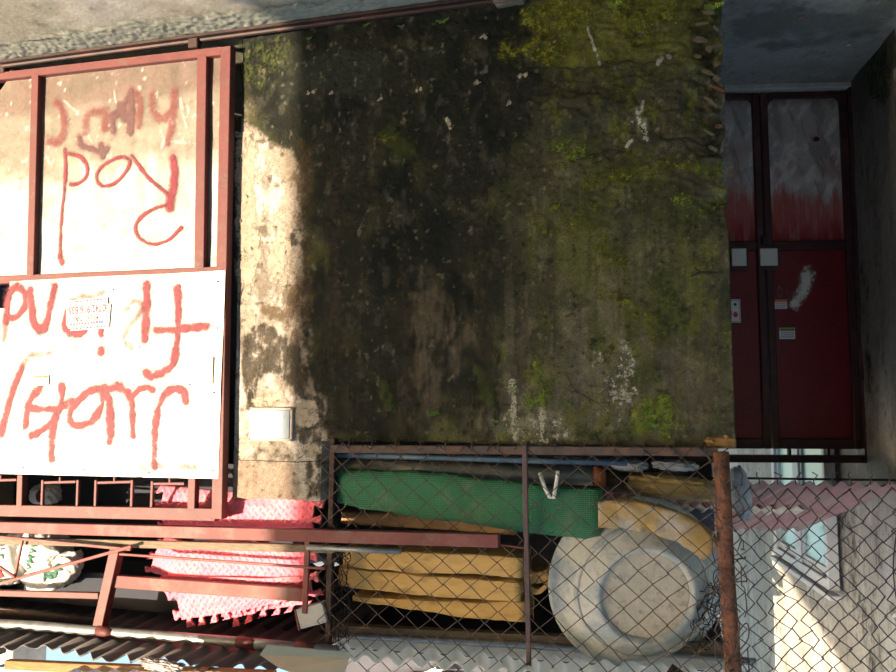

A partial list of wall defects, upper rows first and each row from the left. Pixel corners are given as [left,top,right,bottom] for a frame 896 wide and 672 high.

damp [625,100,649,149]
damp [241,144,359,497]
damp [382,212,569,446]
damp [592,339,638,428]